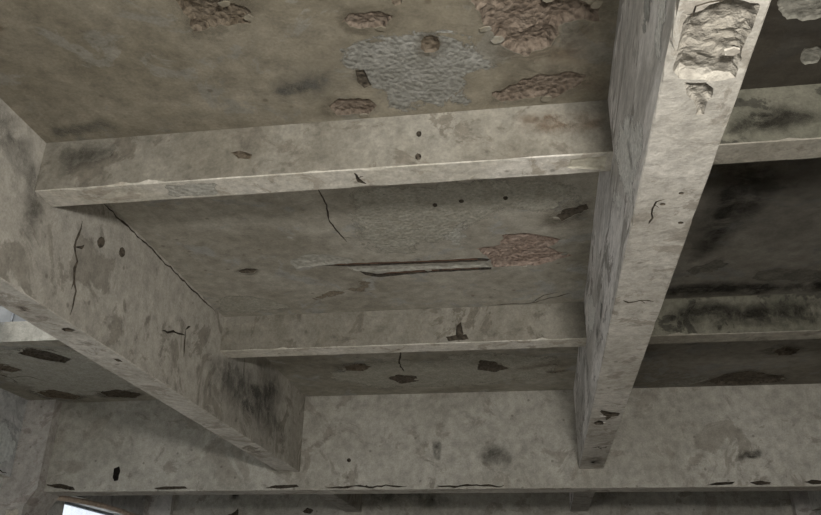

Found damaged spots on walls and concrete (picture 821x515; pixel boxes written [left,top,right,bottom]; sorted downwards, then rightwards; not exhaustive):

spalling [176,0,254,32]
crack [690,0,724,18]
flaking render [777,0,821,21]
flaking render [340,0,603,112]
spalling [673,0,760,115]
spalling [328,98,376,117]
crack [318,190,347,242]
crack [70,224,84,315]
crack [104,204,215,311]
crack [162,326,190,353]